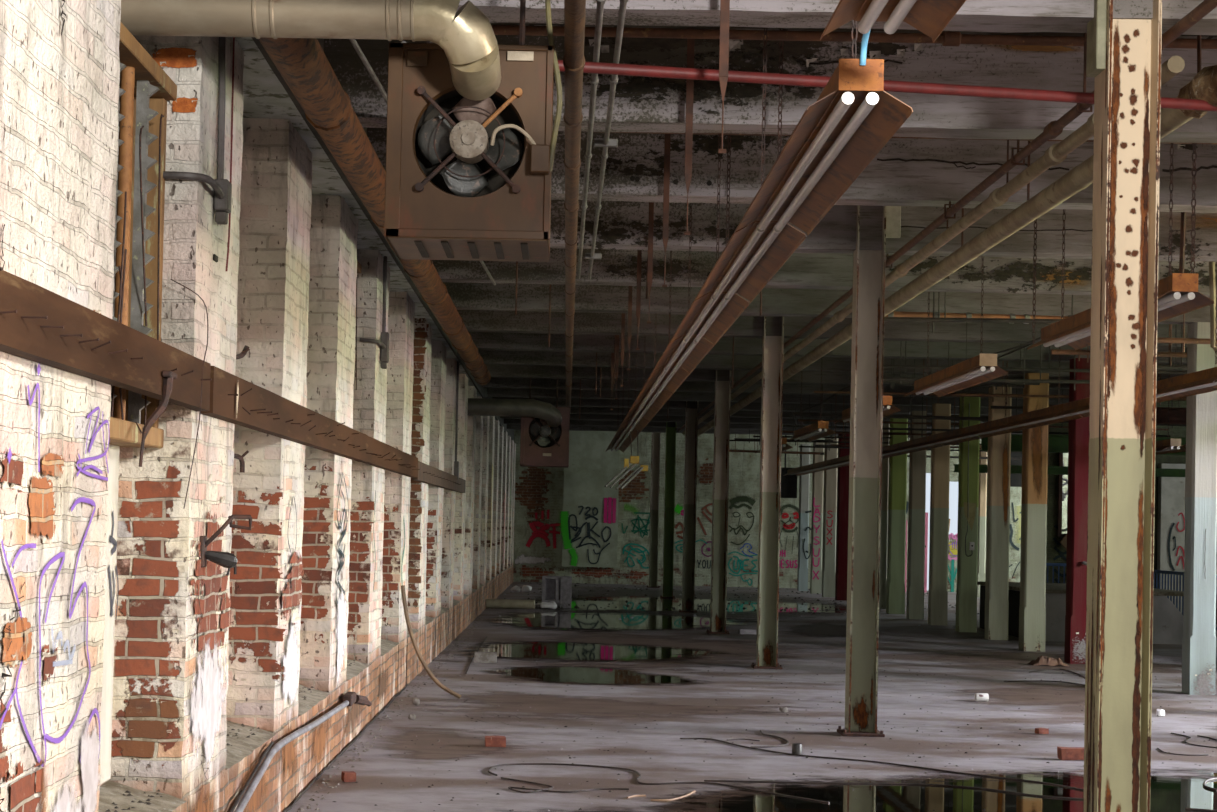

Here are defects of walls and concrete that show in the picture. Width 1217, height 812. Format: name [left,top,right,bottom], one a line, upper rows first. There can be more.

peeling [584,37,923,68]
water stain [889,256,943,275]
water stain [944,258,1092,293]
rust [876,262,885,415]
rust [1086,2,1161,812]
peeling [1,451,65,543]
peeling [2,617,58,686]
peeling [111,461,333,768]
rust [850,641,873,730]
peeling [0,699,44,812]